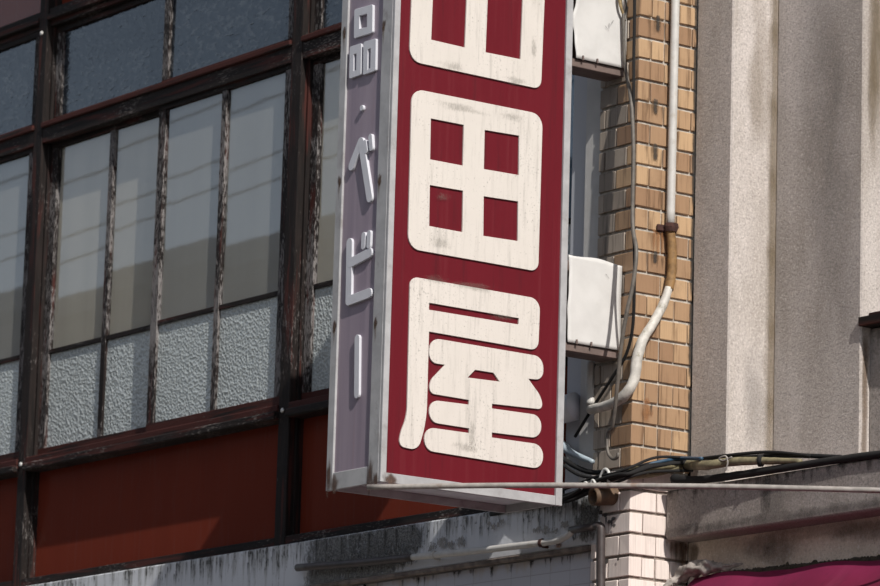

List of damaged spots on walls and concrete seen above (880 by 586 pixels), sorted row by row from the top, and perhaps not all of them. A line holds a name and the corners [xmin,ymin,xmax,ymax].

damp [539,496,600,542]
damp [284,524,424,586]